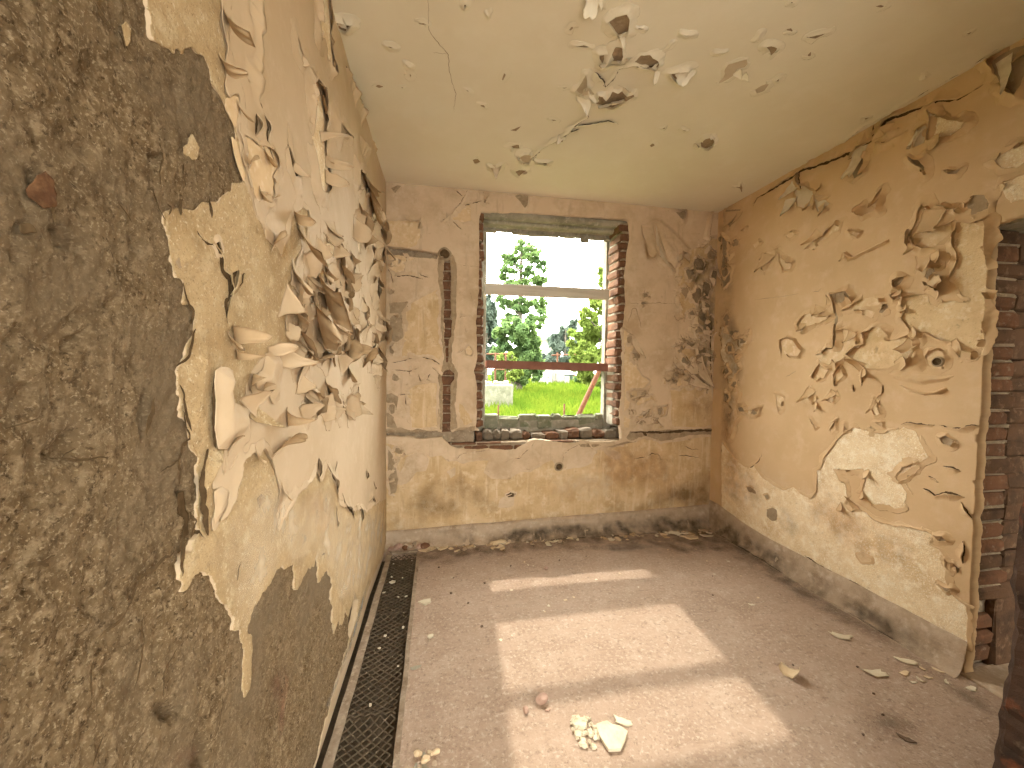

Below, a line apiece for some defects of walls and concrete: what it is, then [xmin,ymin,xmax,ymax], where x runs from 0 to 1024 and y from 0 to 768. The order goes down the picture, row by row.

peeling [710,26,836,97]
crack [752,81,983,206]
peeling [901,101,979,184]
peeling [750,182,891,275]
peeling [778,136,1024,431]
spalling [0,0,743,768]
peeling [718,309,975,652]
water stain [507,519,700,542]
water stain [857,606,894,639]